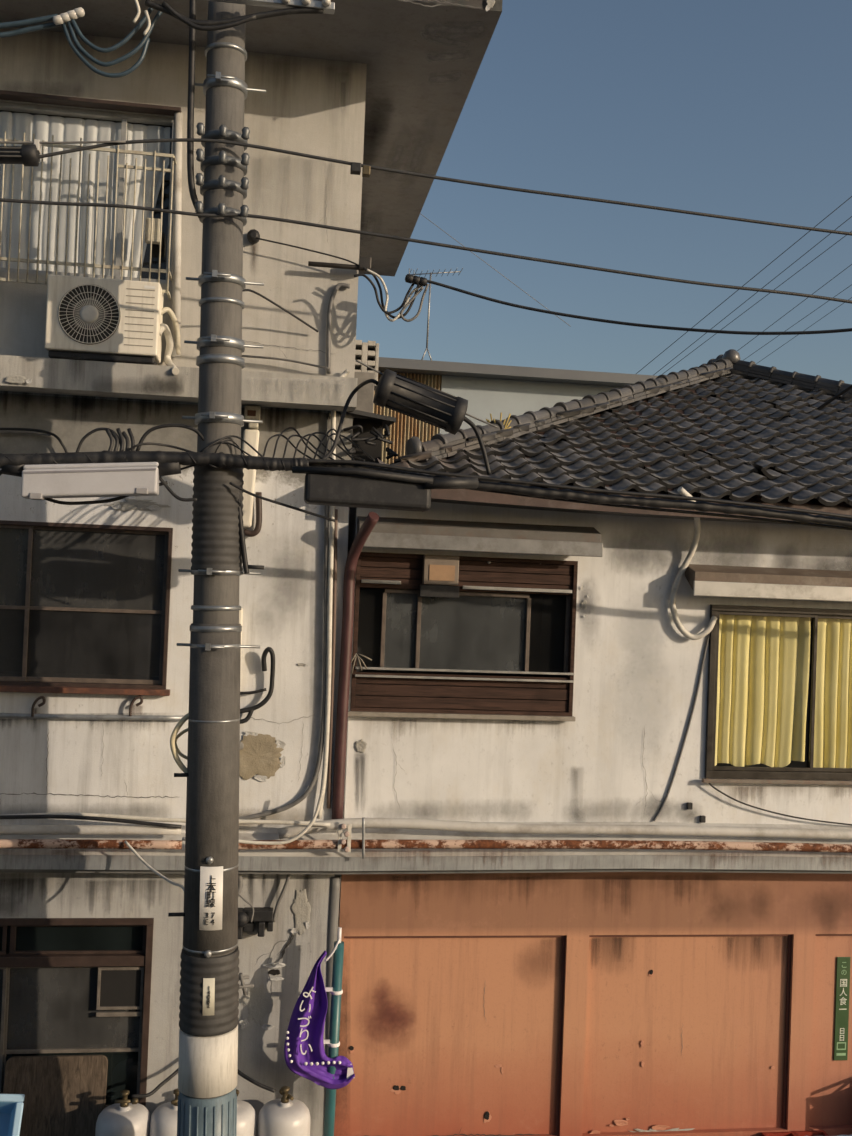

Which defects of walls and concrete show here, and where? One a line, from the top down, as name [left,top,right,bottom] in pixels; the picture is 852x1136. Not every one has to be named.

crack [0,724,174,804]
spalling [239,731,286,782]